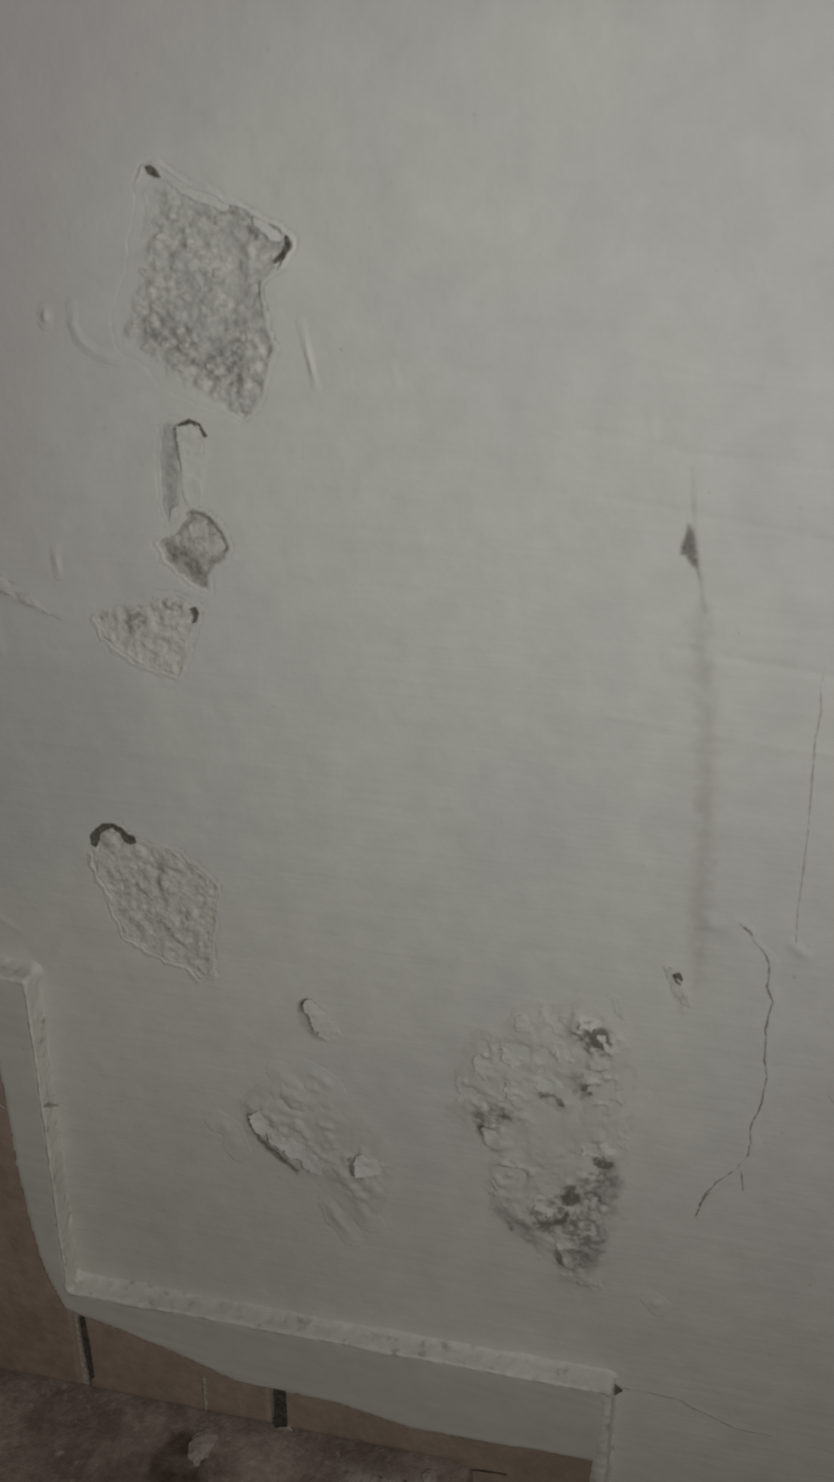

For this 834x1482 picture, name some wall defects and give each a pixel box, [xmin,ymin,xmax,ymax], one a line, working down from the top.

flaking render [66,156,297,596]
flaking render [86,819,224,986]
peeling [301,999,340,1042]
crack [695,665,826,1219]